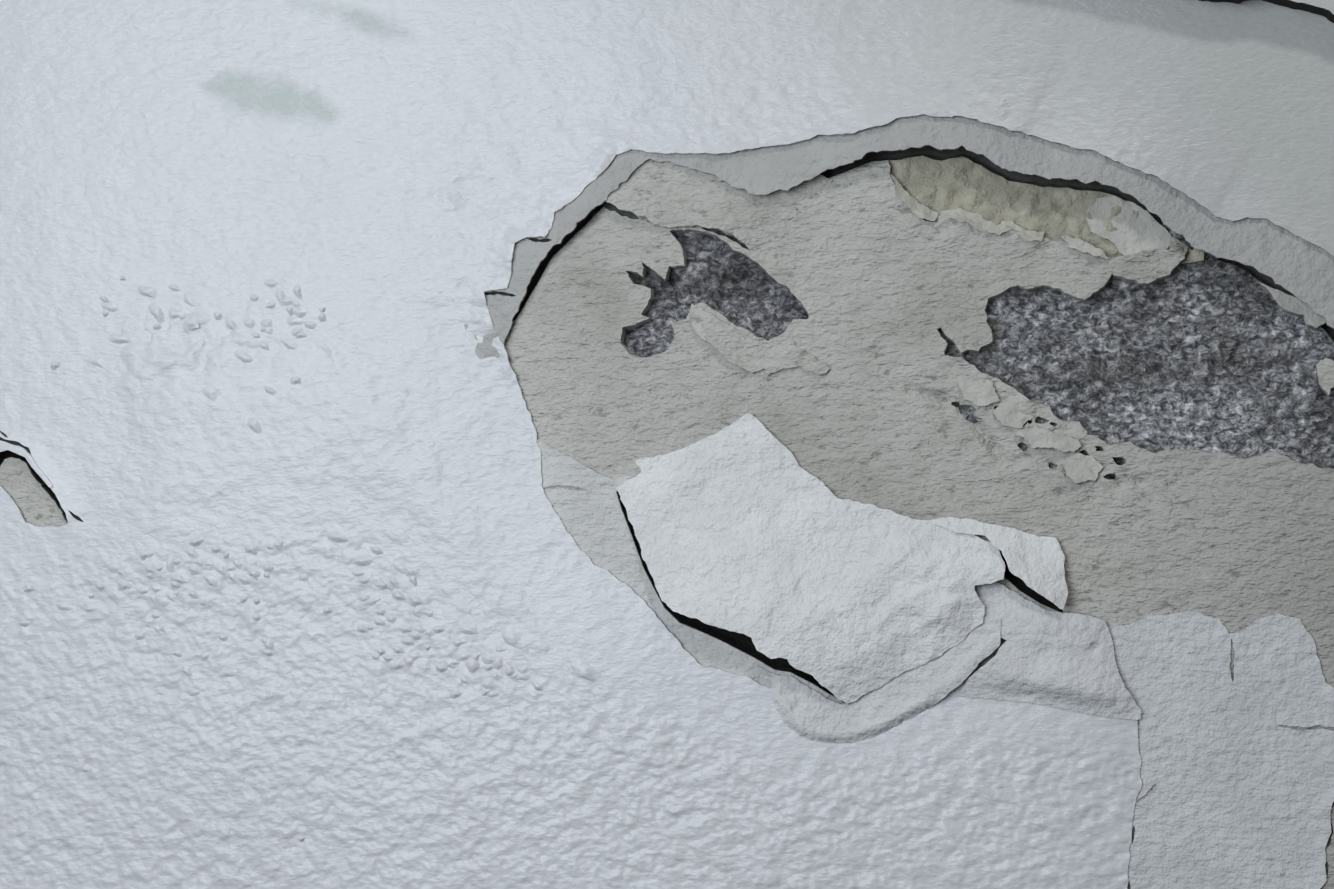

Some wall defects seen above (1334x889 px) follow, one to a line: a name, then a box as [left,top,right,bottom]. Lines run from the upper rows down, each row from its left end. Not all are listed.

peeling [0,431,83,527]
peeling [464,114,1334,889]